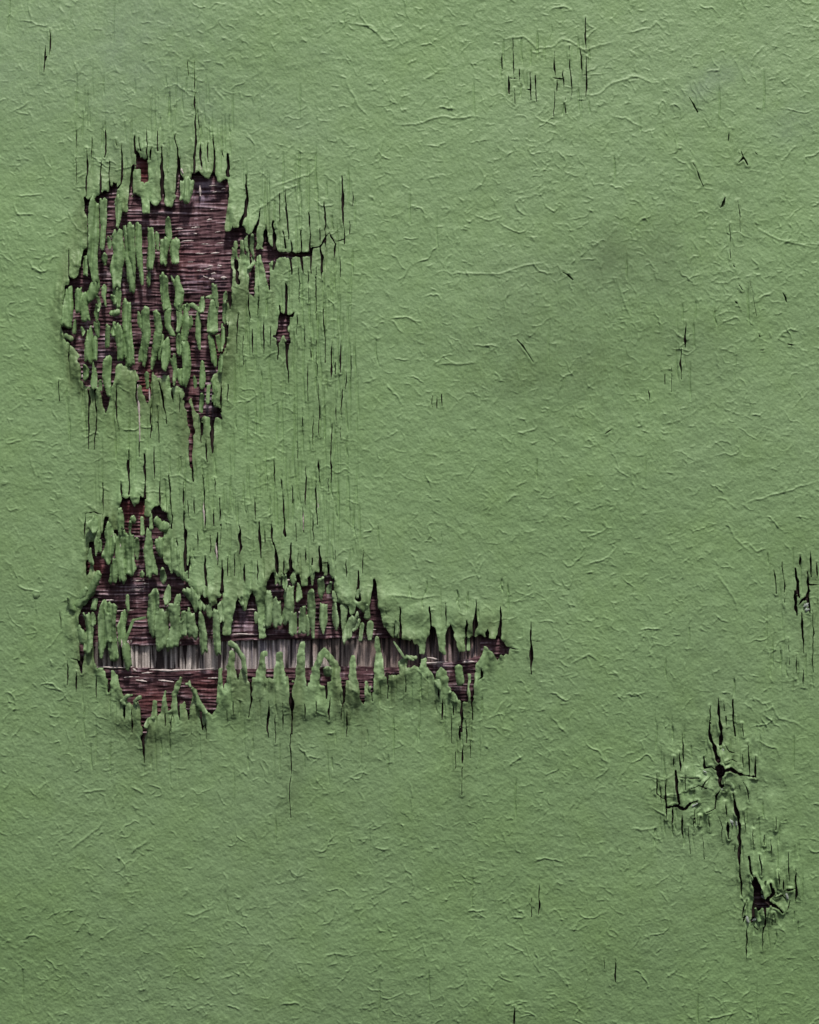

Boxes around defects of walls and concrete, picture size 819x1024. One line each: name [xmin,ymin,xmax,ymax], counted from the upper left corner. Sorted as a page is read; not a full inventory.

crack [501,18,587,116]
peeling [60,62,518,816]
crack [529,628,538,674]
crack [773,554,818,682]
crack [656,698,798,959]